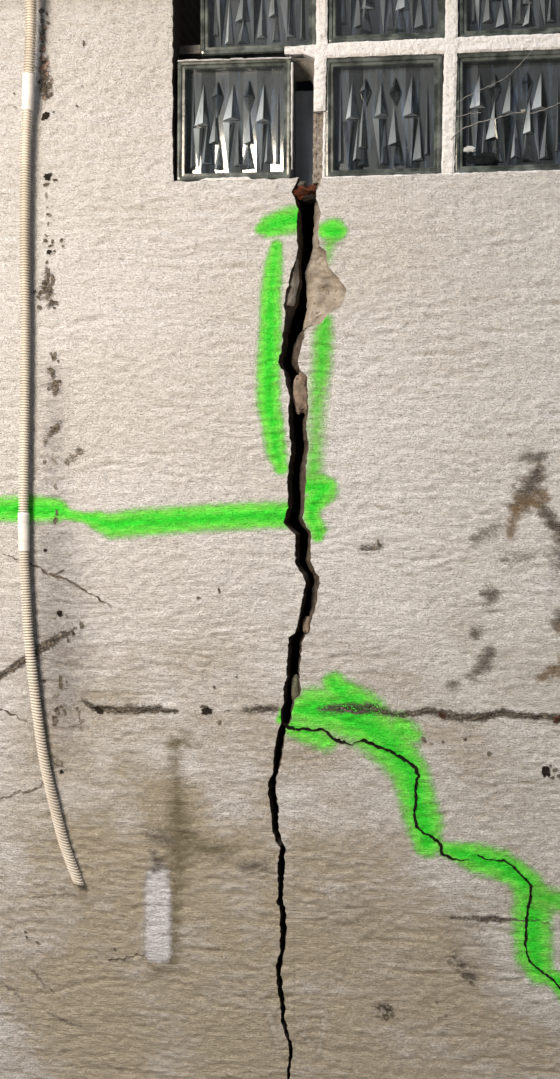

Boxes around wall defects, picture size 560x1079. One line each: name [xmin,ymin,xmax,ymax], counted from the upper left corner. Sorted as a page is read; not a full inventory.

corrosion [293,181,317,203]
spalling [302,247,346,331]
crack [81,179,560,1079]